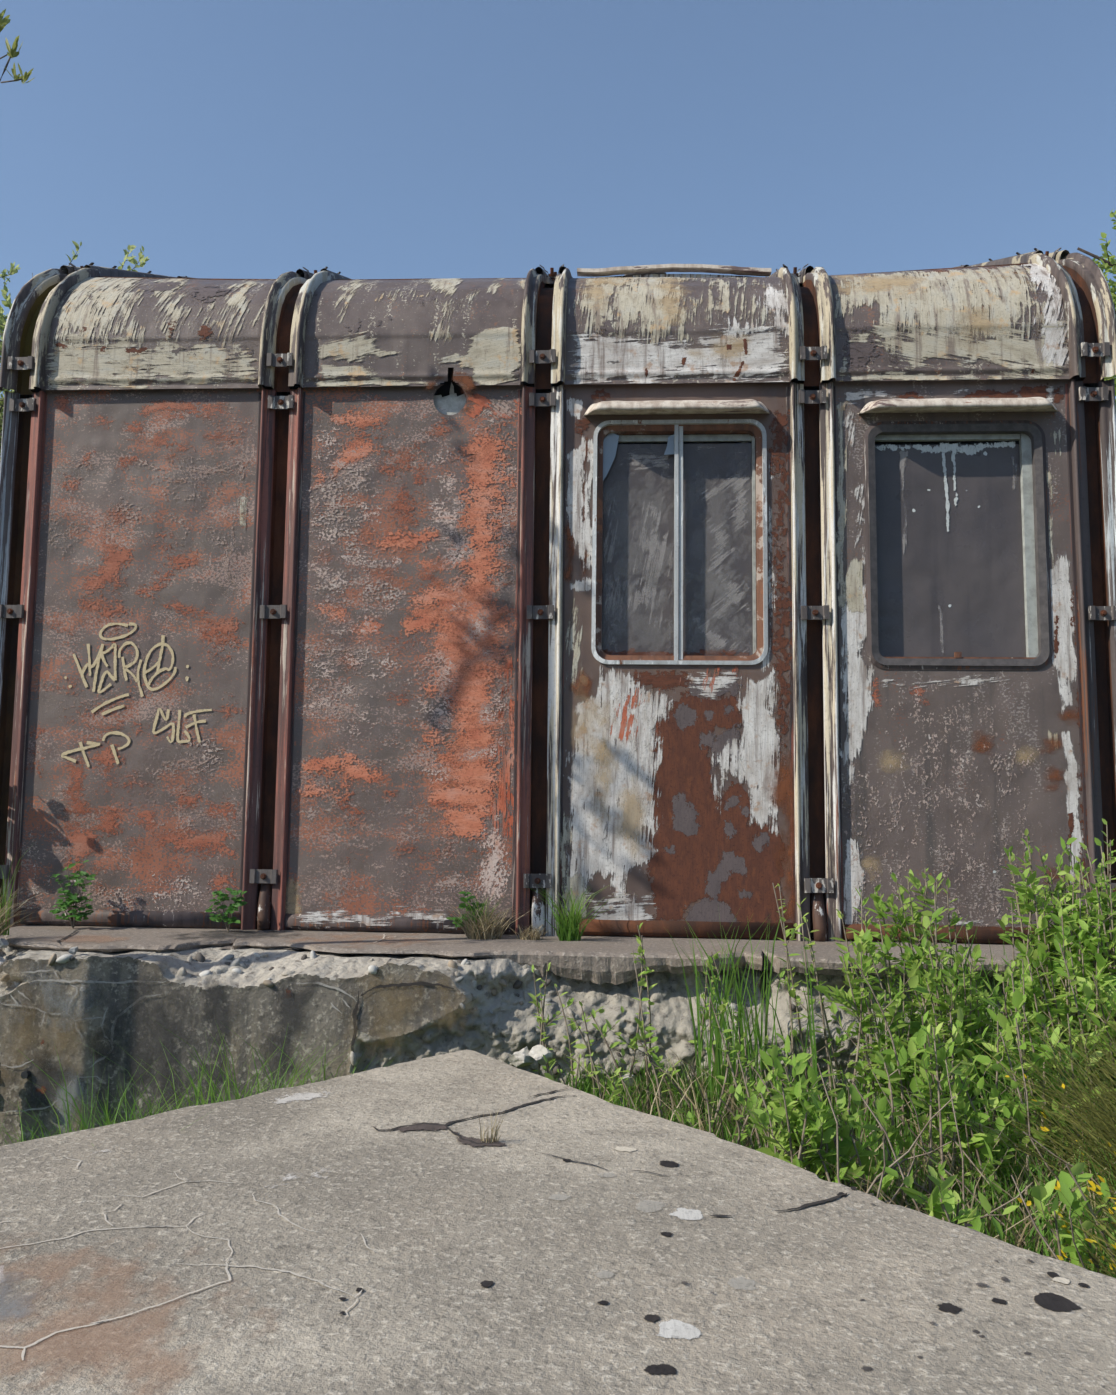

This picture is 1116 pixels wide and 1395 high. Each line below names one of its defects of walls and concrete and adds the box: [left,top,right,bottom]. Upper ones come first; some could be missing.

peeling [567,277,790,420]
peeling [829,263,1069,382]
peeling [39,277,274,661]
peeling [287,278,526,928]
peeling [560,436,673,921]
peeling [680,507,780,835]
peeling [835,401,1084,927]
spalling [0,946,947,1095]
spalling [941,973,1023,1043]
crack [374,1088,576,1145]
crack [543,1153,670,1177]